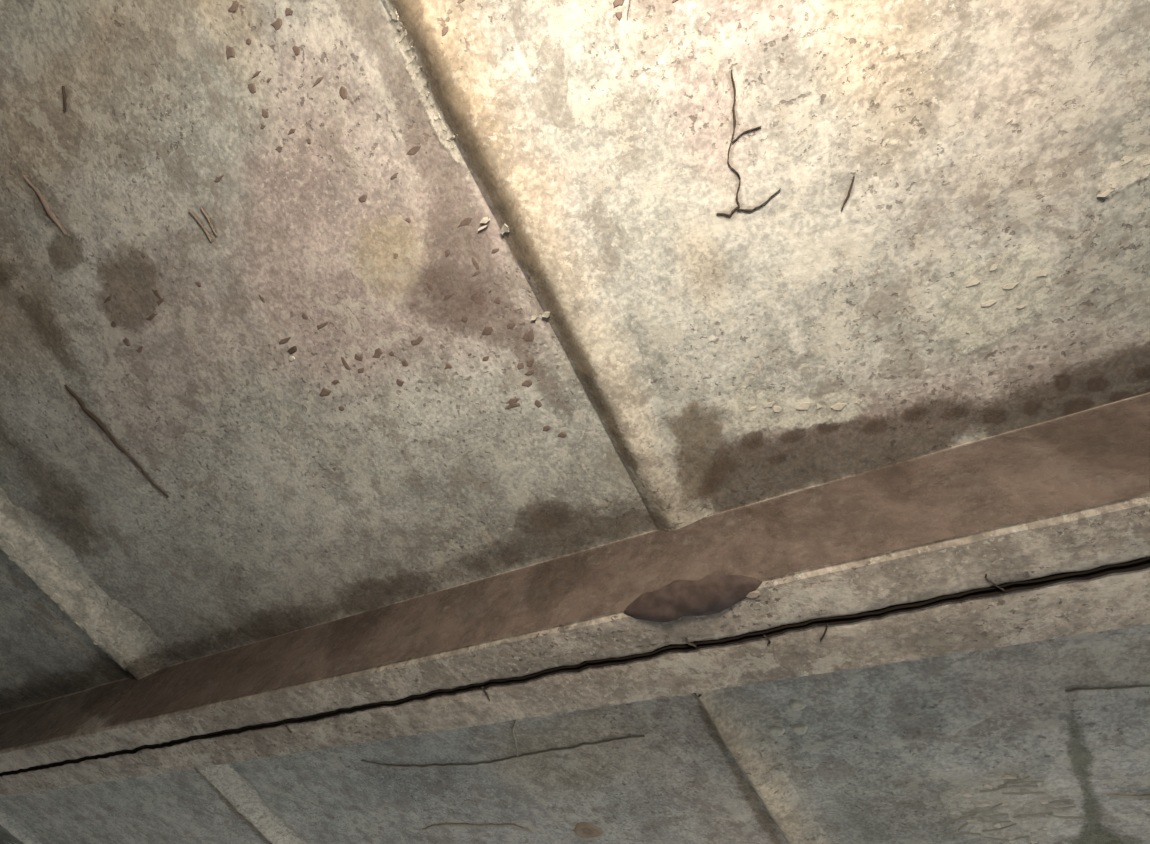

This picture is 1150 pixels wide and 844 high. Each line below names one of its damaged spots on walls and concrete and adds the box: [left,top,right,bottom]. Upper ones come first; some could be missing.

crack [717,69,781,216]
crack [64,384,169,498]
water stain [0,342,1150,749]
crack [0,557,1150,777]